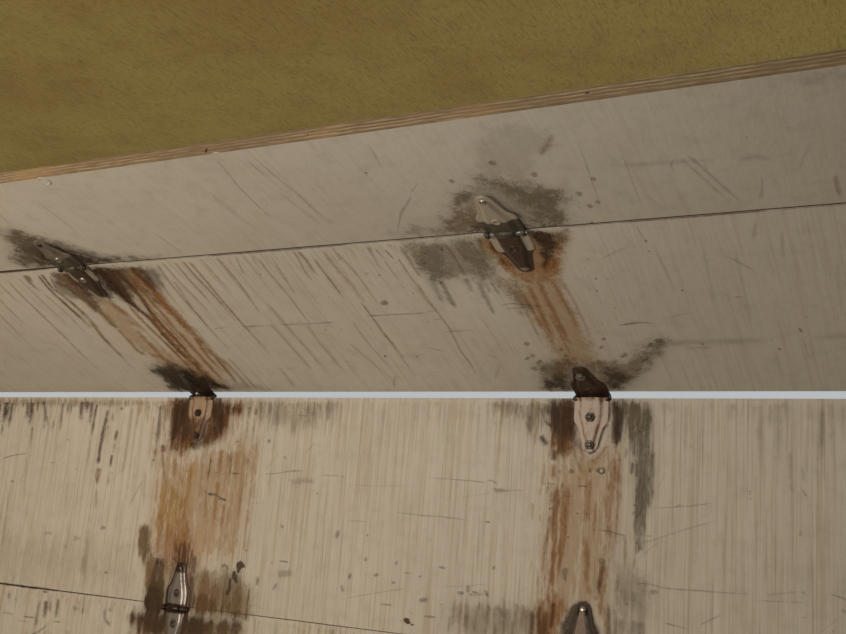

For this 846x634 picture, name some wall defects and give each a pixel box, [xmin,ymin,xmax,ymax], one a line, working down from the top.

corrosion [40,274,115,327]
corrosion [90,267,224,372]
corrosion [483,231,564,332]
corrosion [162,398,242,456]
corrosion [540,399,575,460]
corrosion [589,400,623,458]
corrosion [544,491,569,580]
corrosion [129,519,249,634]
corrosion [530,595,599,634]